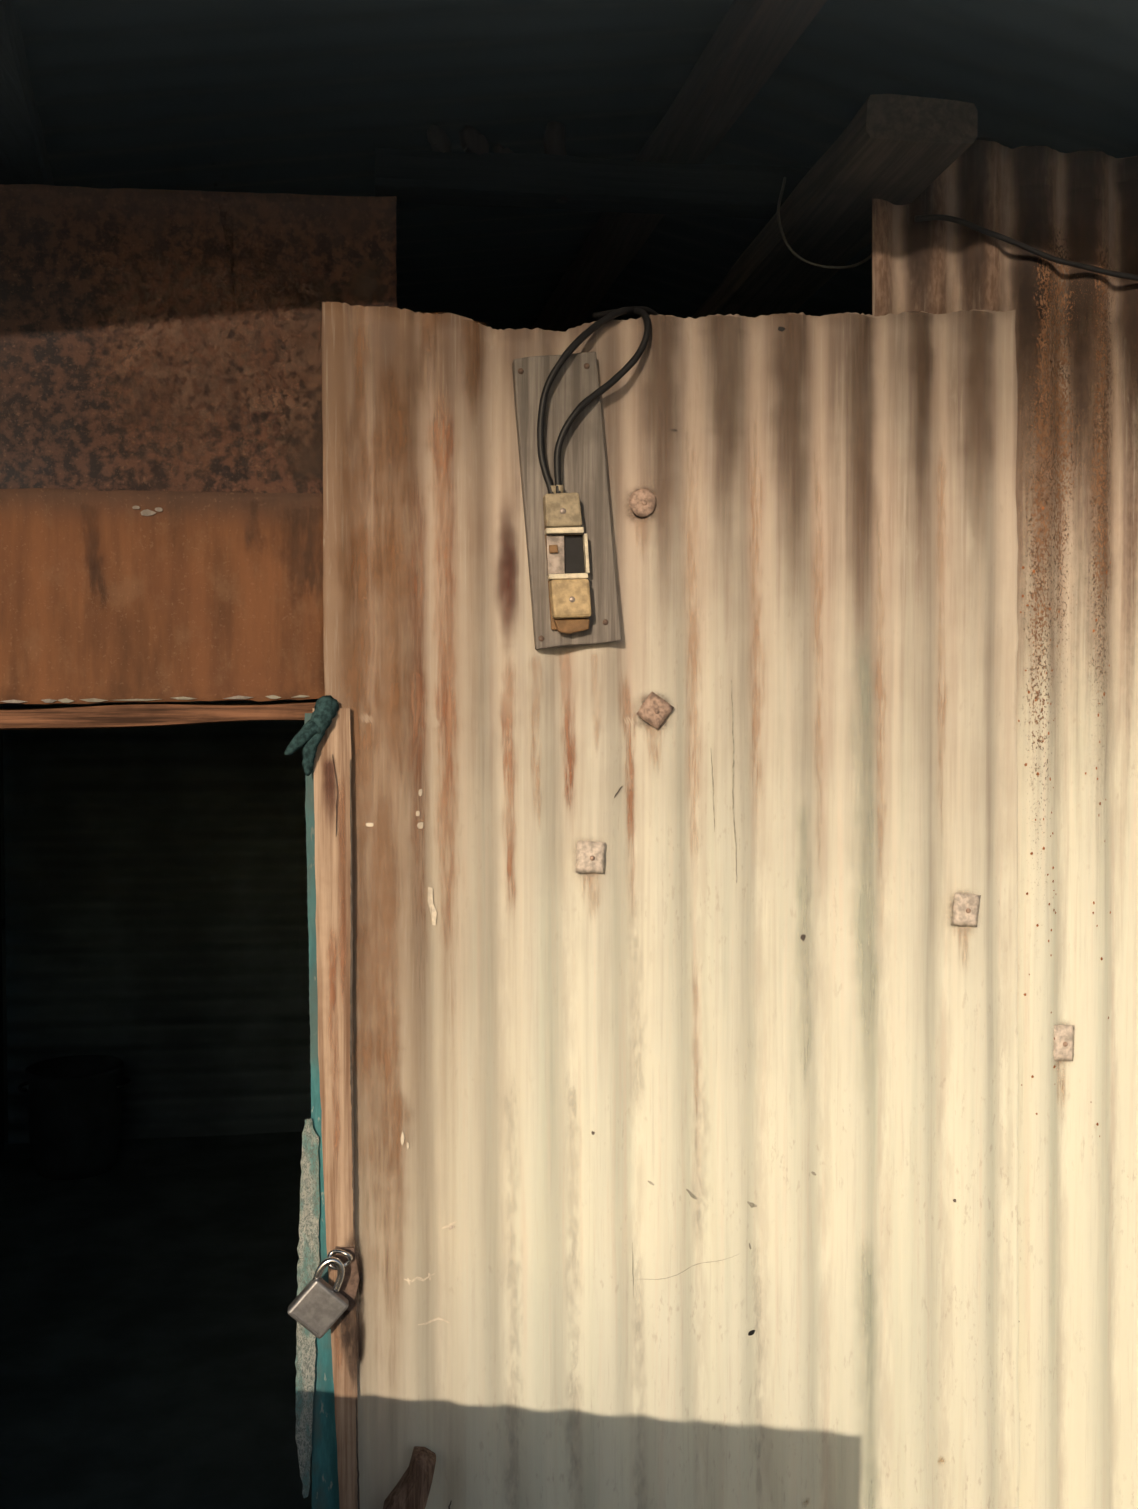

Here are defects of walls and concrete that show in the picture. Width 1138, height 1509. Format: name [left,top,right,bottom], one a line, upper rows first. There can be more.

corrosion [102,256,322,442]
corrosion [433,413,453,482]
corrosion [132,506,163,516]
corrosion [1018,235,1111,788]
corrosion [499,526,516,624]
corrosion [342,519,455,808]
corrosion [325,762,334,801]
corrosion [503,716,513,789]
corrosion [564,708,574,799]
corrosion [625,723,634,834]
corrosion [329,923,402,1169]